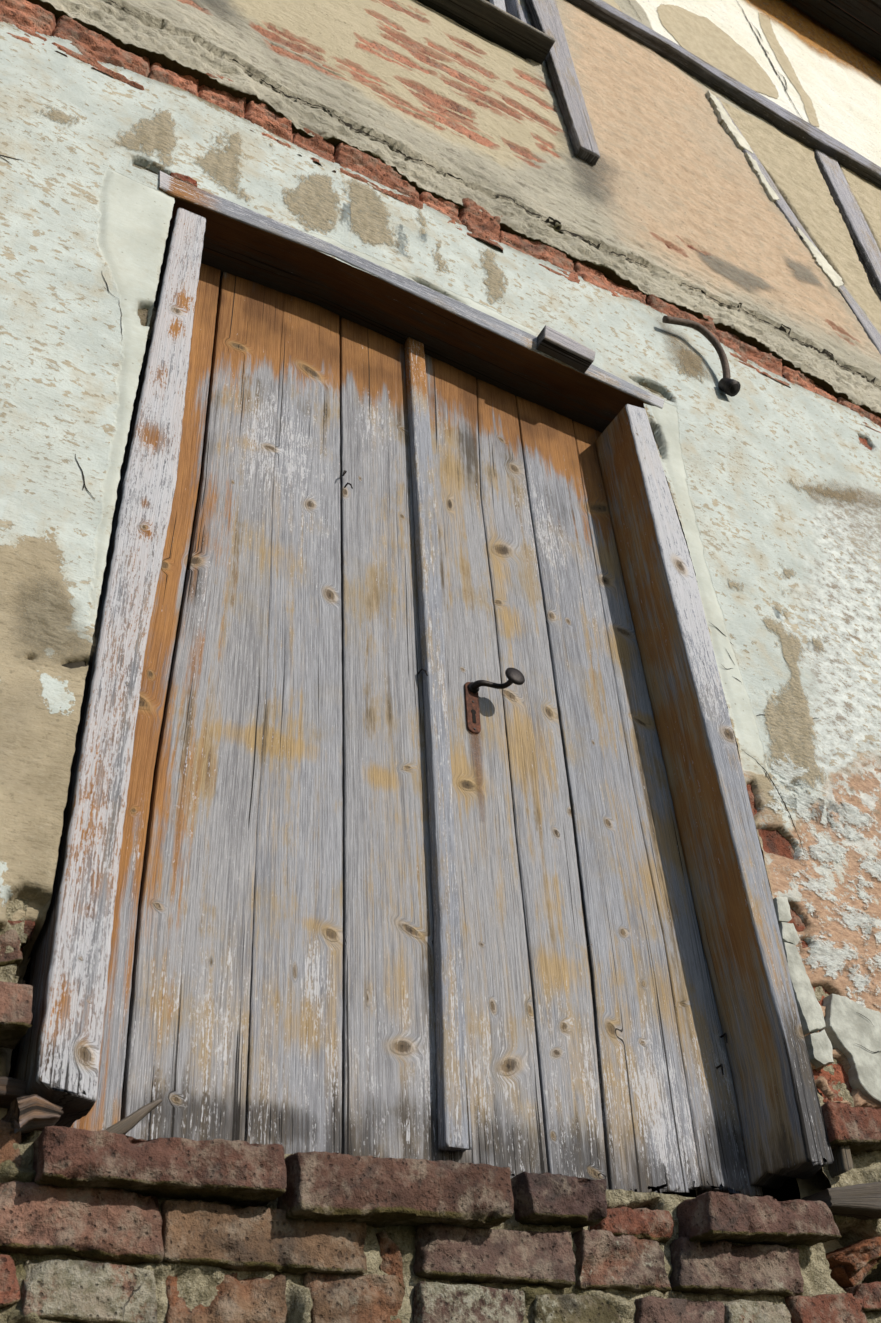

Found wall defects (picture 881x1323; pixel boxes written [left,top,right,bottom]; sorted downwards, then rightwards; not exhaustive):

spalling [0,0,881,450]
spalling [62,661,89,669]
peeling [746,606,881,1105]
peeling [787,478,857,502]